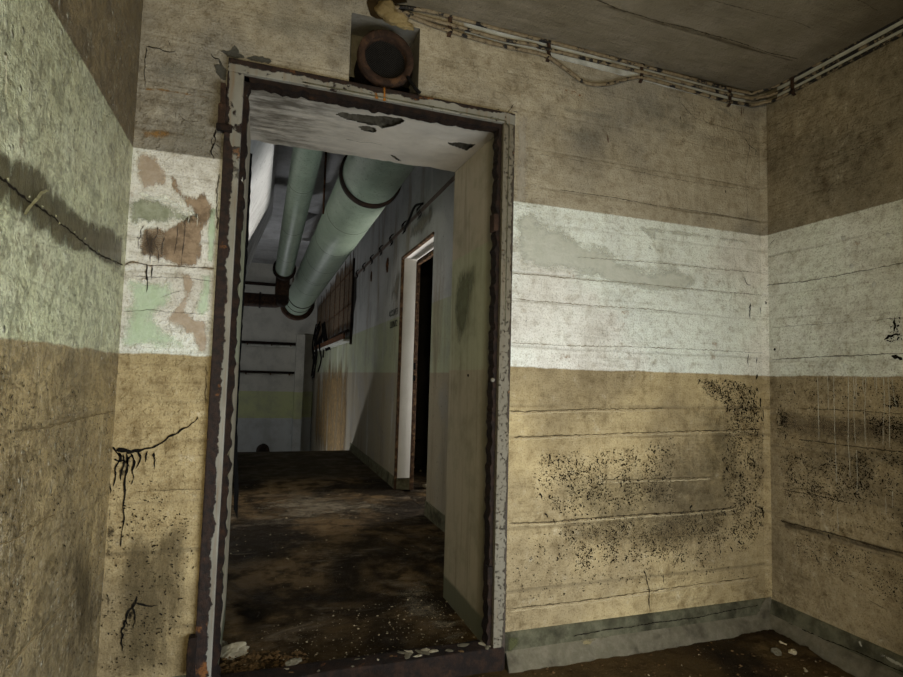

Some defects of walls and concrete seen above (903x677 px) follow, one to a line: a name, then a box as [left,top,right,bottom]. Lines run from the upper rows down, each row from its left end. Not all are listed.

water stain [0,154,135,268]
crack [0,176,214,314]
water stain [130,189,198,292]
peeling [138,155,220,351]
crack [109,416,202,547]
water stain [512,374,764,600]
water stain [776,373,903,609]
crack [120,597,157,650]